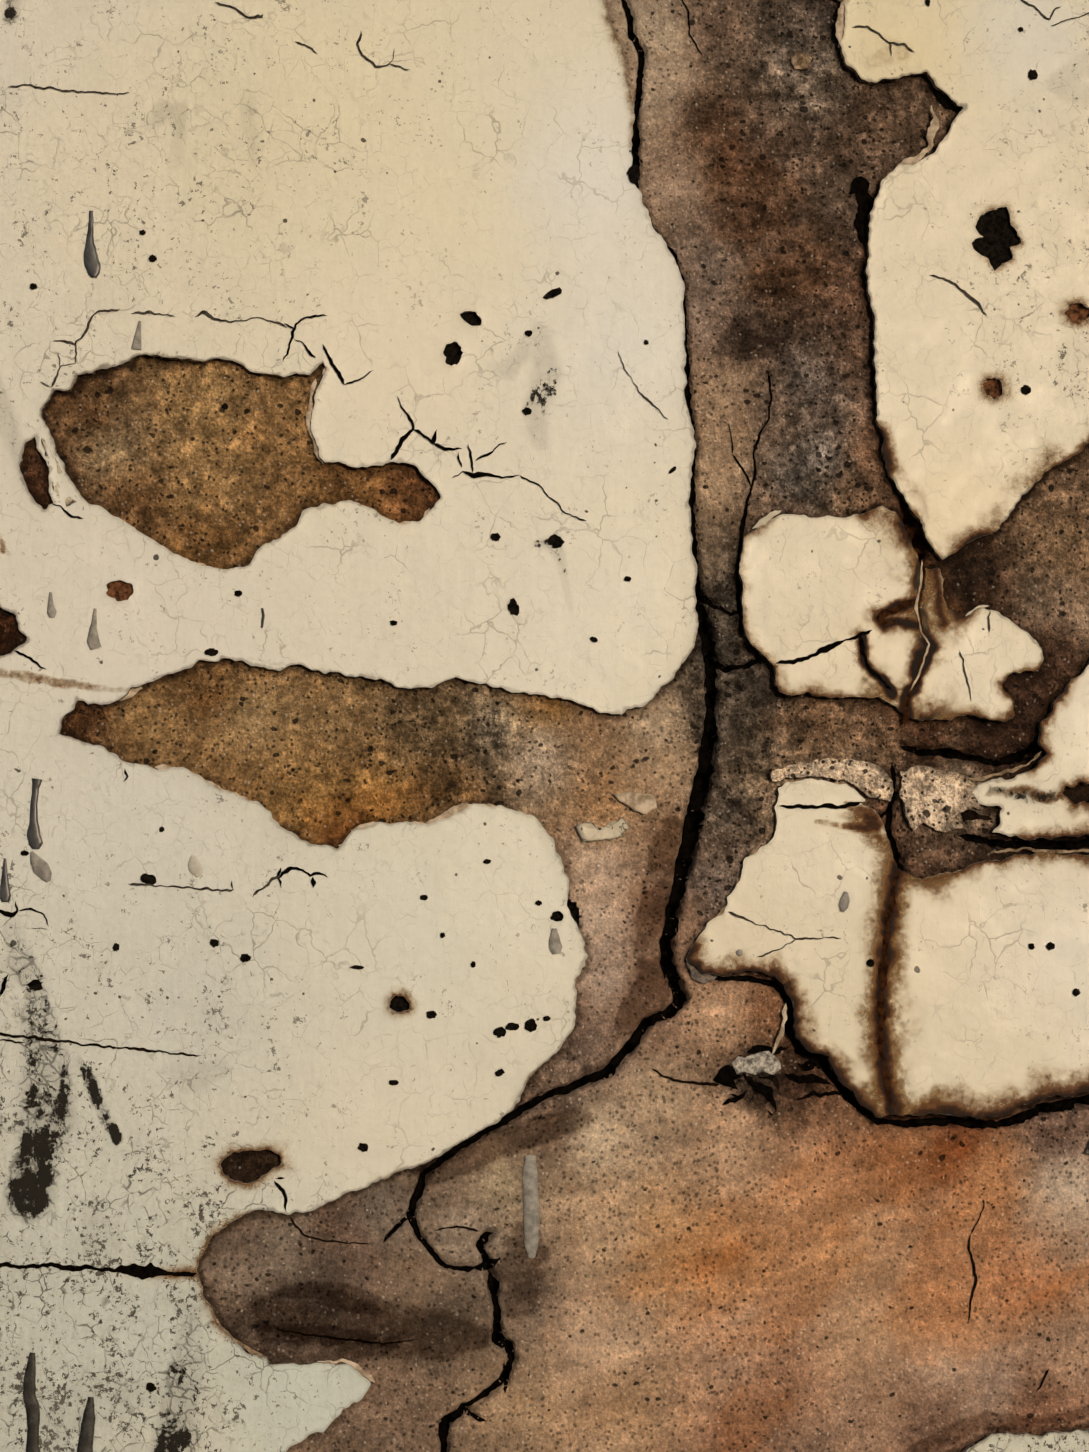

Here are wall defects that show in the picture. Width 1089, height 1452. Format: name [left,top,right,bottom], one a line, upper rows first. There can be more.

peeling [543,287,562,299]
peeling [460,312,481,326]
peeling [443,343,463,366]
peeling [20,356,440,570]
peeling [604,0,1089,984]
peeling [547,534,565,548]
peeling [106,581,134,601]
peeling [508,598,519,615]
peeling [0,607,27,656]
crack [274,0,1089,1452]
peeling [61,630,1089,1452]